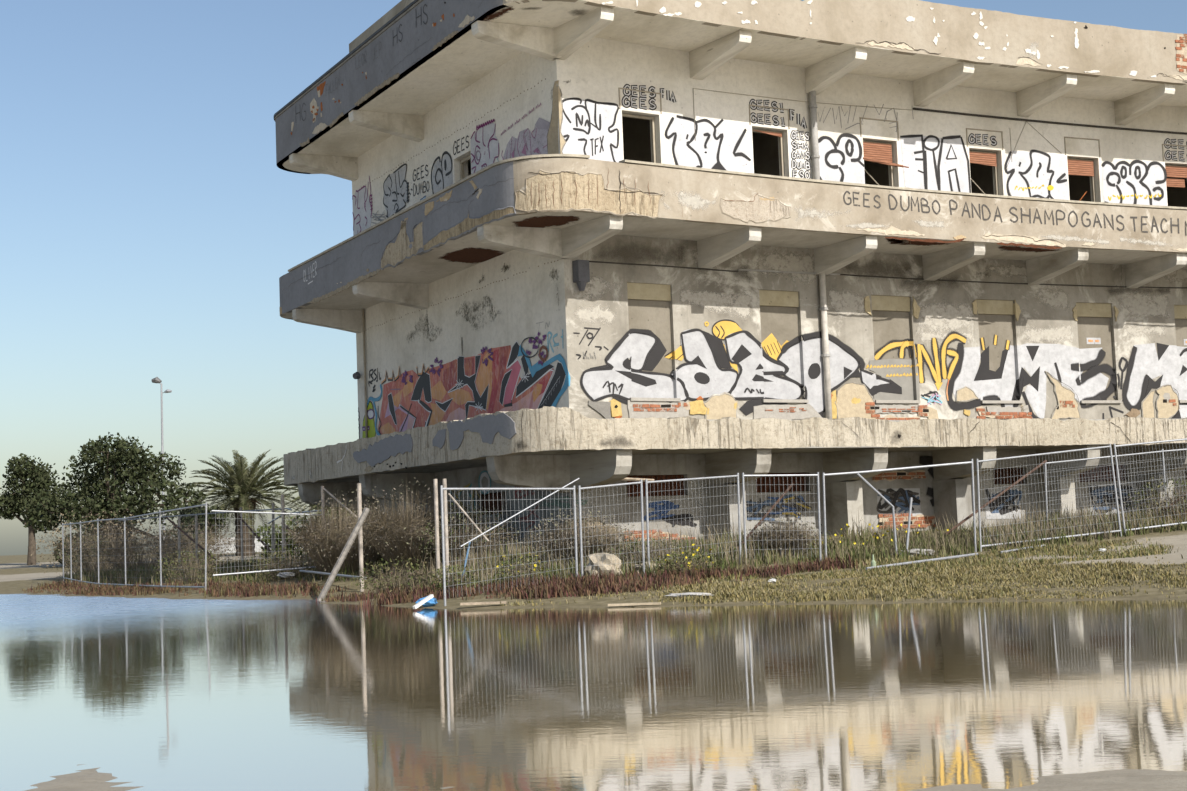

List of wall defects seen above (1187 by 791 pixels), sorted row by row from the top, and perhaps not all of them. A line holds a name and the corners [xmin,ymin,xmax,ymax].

spalling [431,2,475,51]
spalling [1151,34,1187,82]
spalling [290,73,400,147]
spalling [547,80,569,154]
spalling [311,169,837,303]
spalling [847,220,966,243]
spalling [982,233,1172,249]
peeling [575,277,616,323]
peeling [680,288,752,318]
peeling [912,296,978,341]
peeling [1013,286,1078,343]
peeling [1114,292,1168,336]